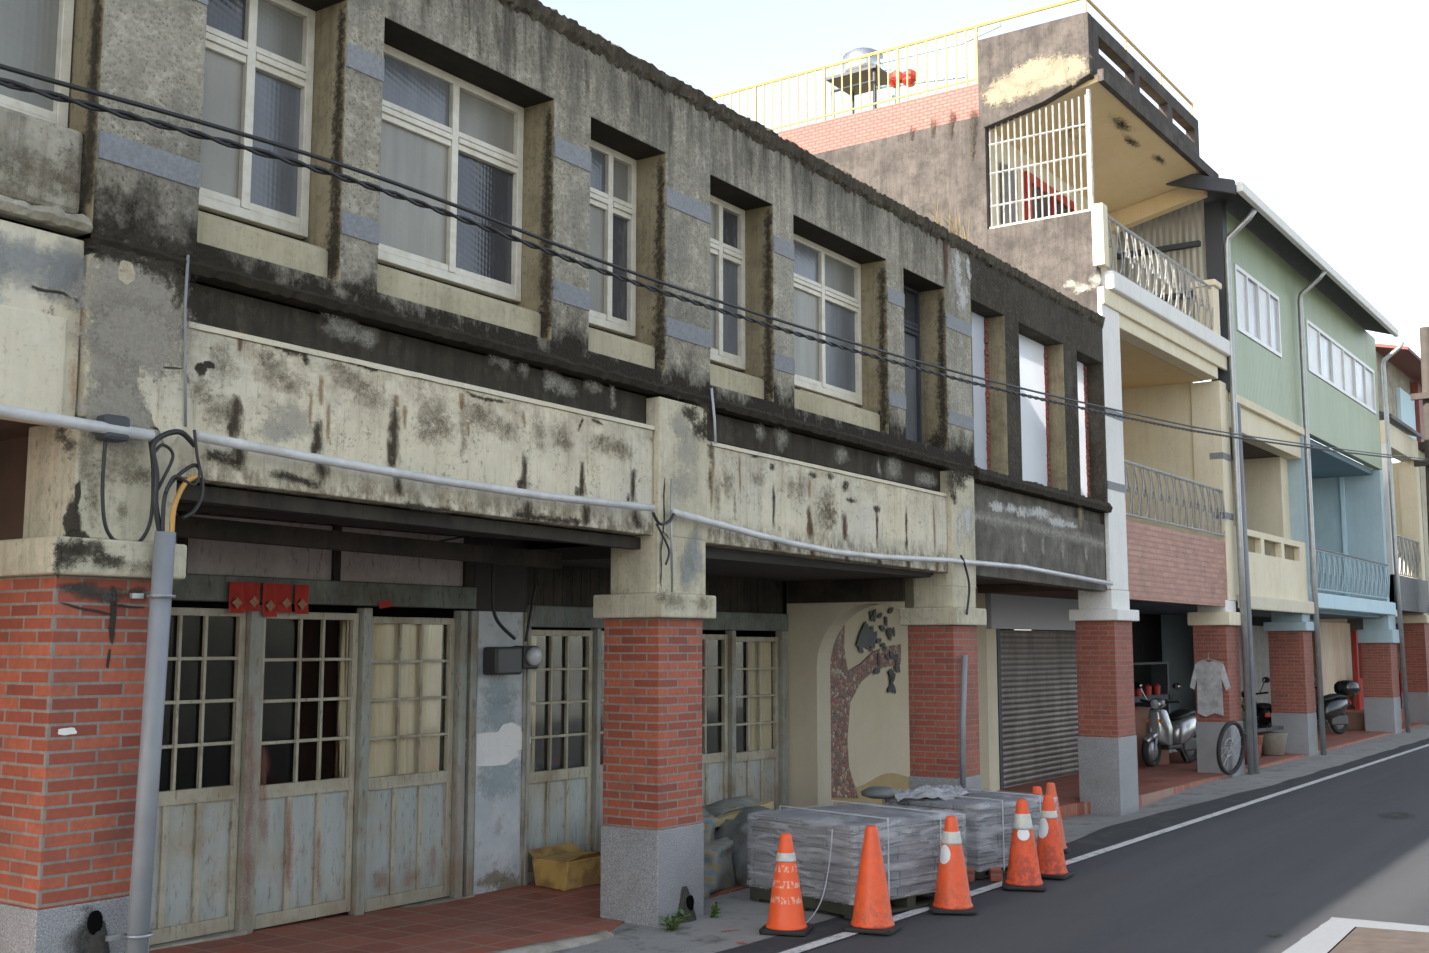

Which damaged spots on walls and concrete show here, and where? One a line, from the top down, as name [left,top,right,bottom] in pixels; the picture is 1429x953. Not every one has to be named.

damp [261,346,309,389]
damp [196,386,245,470]
damp [271,421,329,488]
damp [335,355,453,514]
damp [422,392,510,449]
damp [514,456,590,527]
damp [752,454,857,562]
damp [947,456,1103,559]
damp [53,538,152,602]
peeling [476,723,531,766]
spalling [477,871,519,890]